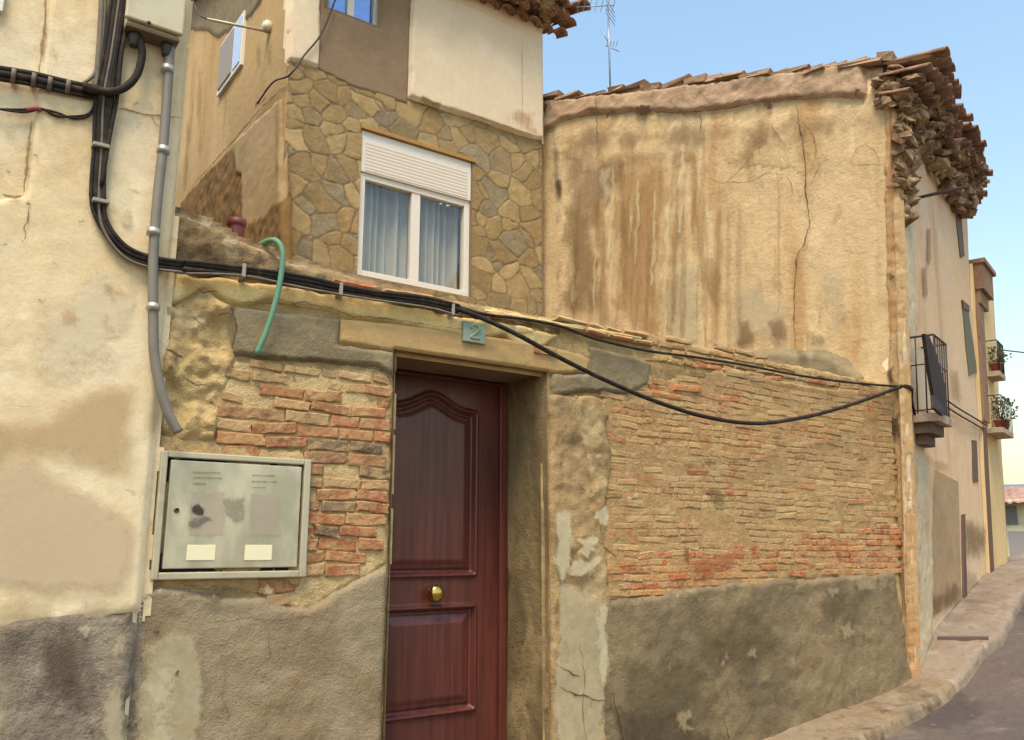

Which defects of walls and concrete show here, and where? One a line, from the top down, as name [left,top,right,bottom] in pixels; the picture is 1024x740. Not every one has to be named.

leakage [556,128,635,308]
leakage [664,262,700,340]
crack [561,96,821,340]
leakage [733,287,785,344]
flaking render [257,568,296,606]
flaking render [198,359,393,577]
flaking render [554,335,905,740]